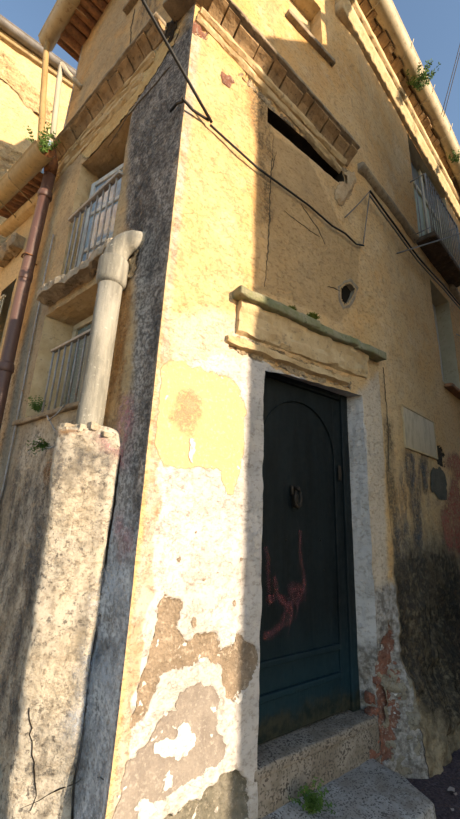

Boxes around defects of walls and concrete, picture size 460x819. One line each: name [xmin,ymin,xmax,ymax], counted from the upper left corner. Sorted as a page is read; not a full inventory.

peeling [154,360,247,495]
damp [0,472,41,666]
crack [20,455,121,819]
peeling [113,592,258,819]
spalling [364,623,422,775]
damp [384,423,460,728]